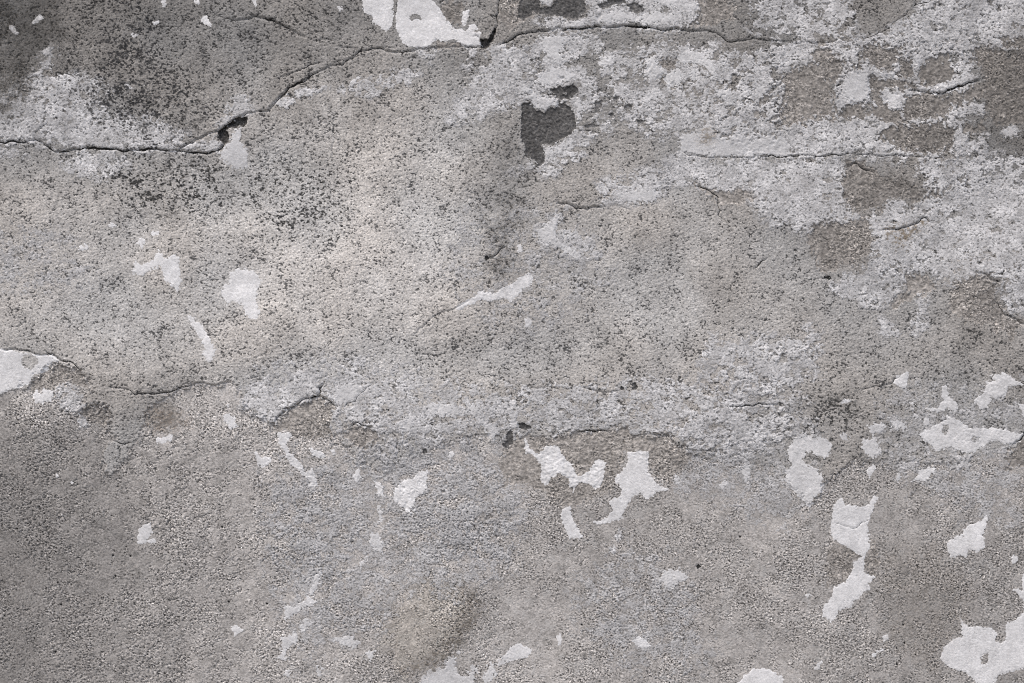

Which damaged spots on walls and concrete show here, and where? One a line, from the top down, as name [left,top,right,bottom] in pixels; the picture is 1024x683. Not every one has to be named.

crack [1,0,829,155]
peeling [273,0,1024,342]
peeling [131,249,182,292]
peeling [221,268,263,319]
crack [122,382,198,395]
crack [276,381,378,427]
spalling [0,315,1024,683]